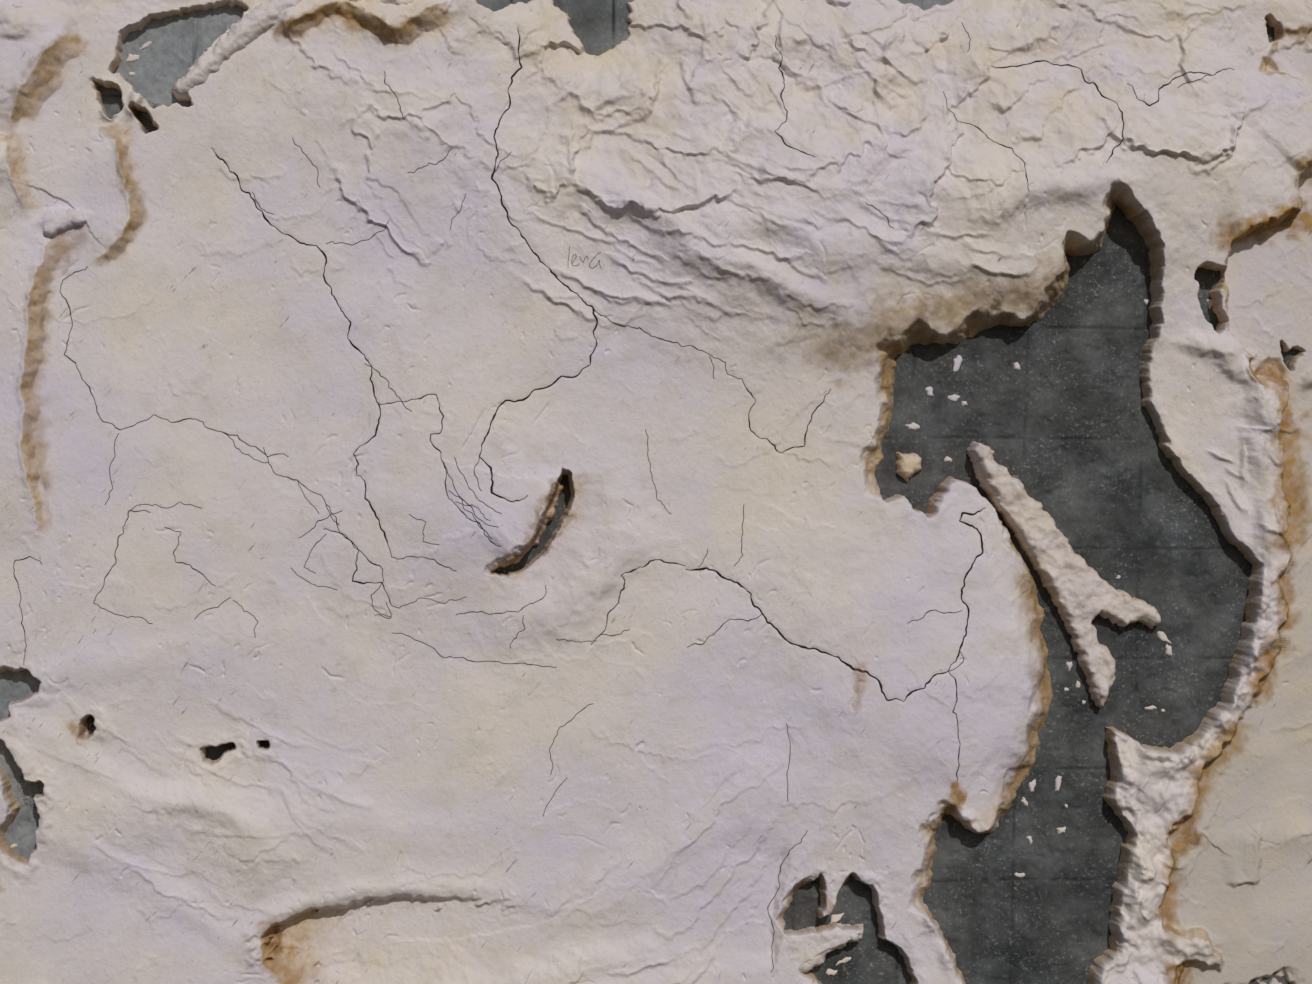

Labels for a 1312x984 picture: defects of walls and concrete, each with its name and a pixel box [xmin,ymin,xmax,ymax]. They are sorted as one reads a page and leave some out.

flaking render [1266,23,1275,42]
flaking render [84,5,247,273]
crack [943,91,1030,192]
crack [60,31,986,781]
spalling [489,469,571,573]
flaking render [874,205,1291,984]
flaking render [0,670,41,720]
spalling [78,715,96,740]
flaking render [0,740,44,860]
flaking render [783,875,912,984]